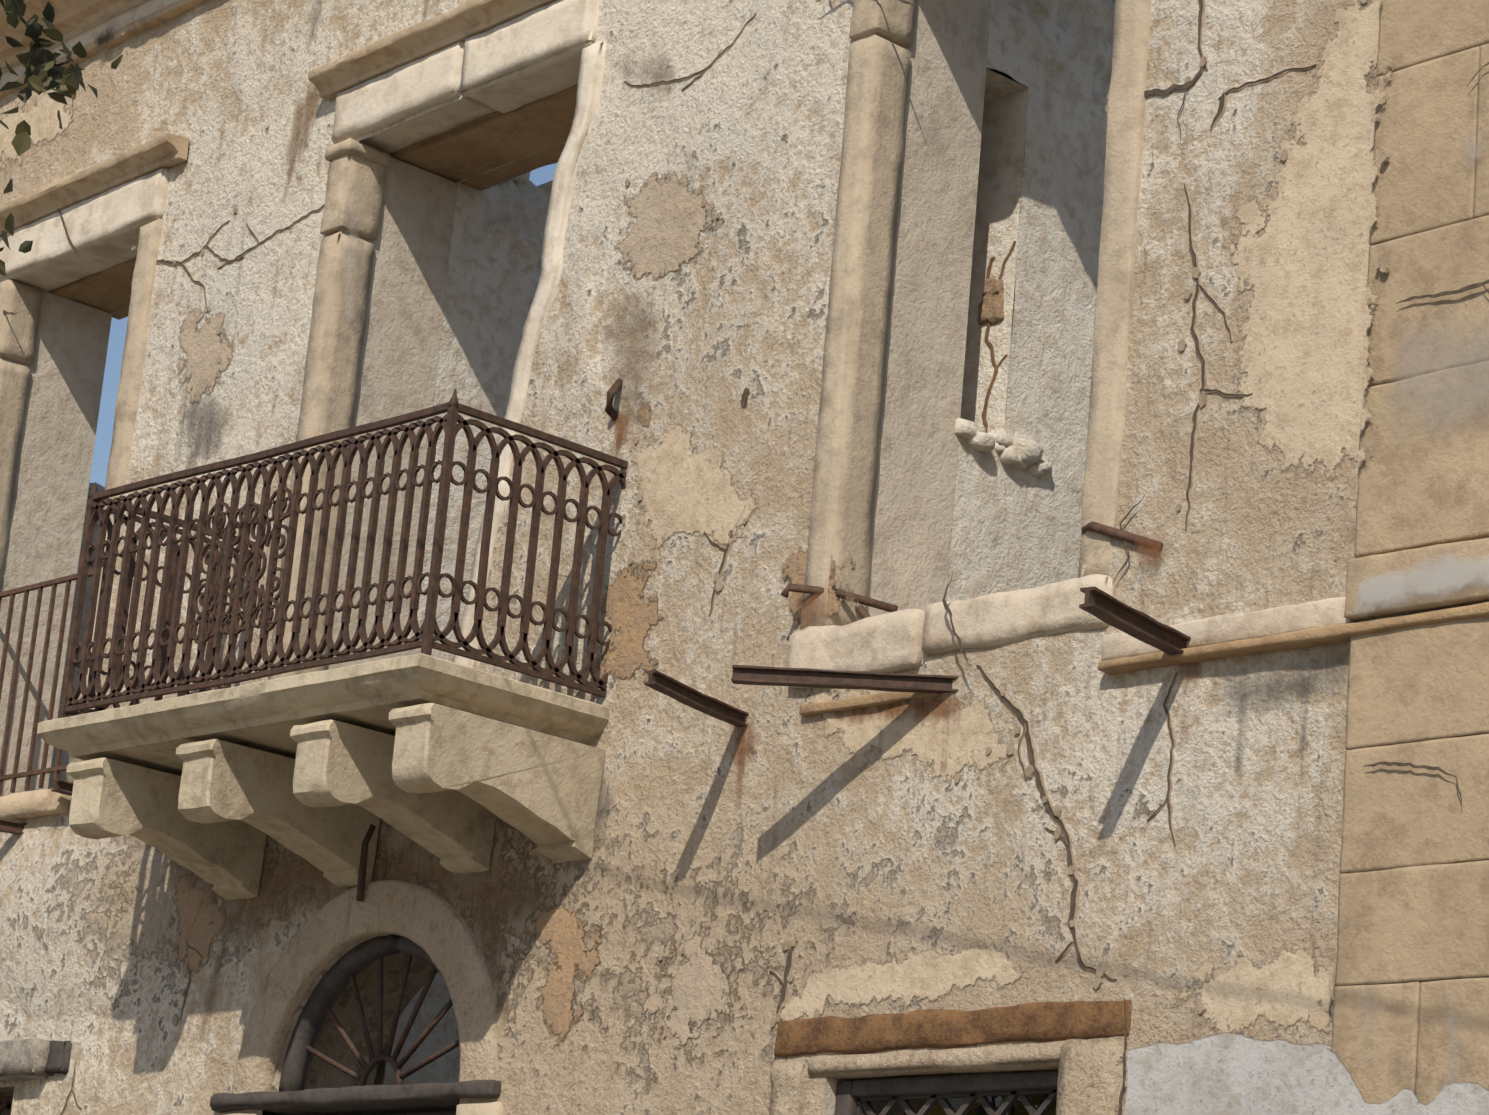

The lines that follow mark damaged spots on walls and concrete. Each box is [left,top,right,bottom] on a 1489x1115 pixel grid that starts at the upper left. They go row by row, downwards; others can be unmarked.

crack [624,13,757,92]
crack [1144,0,1317,140]
crack [131,204,325,312]
spalling [614,167,720,280]
crack [986,241,1016,279]
peeling [1213,0,1393,480]
spalling [173,299,235,404]
crack [981,321,1007,433]
crack [1113,183,1253,583]
crack [1147,672,1178,846]
crack [942,574,1127,1115]
spalling [531,892,602,1045]